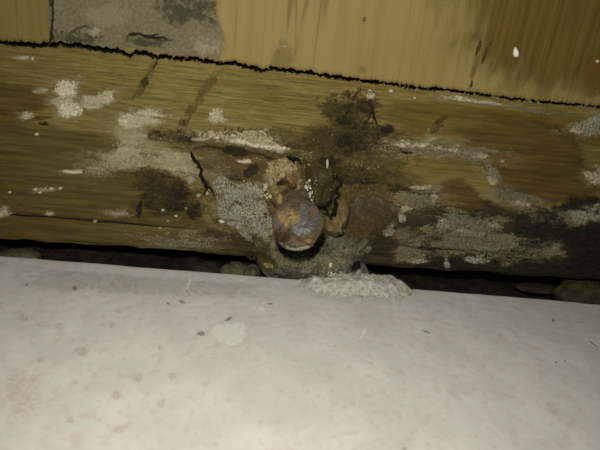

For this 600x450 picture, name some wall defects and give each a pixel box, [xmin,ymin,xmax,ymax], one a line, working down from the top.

damp [48,0,224,58]
crack [0,0,600,126]
crack [187,148,215,198]
damp [0,60,600,279]
crack [322,178,345,220]